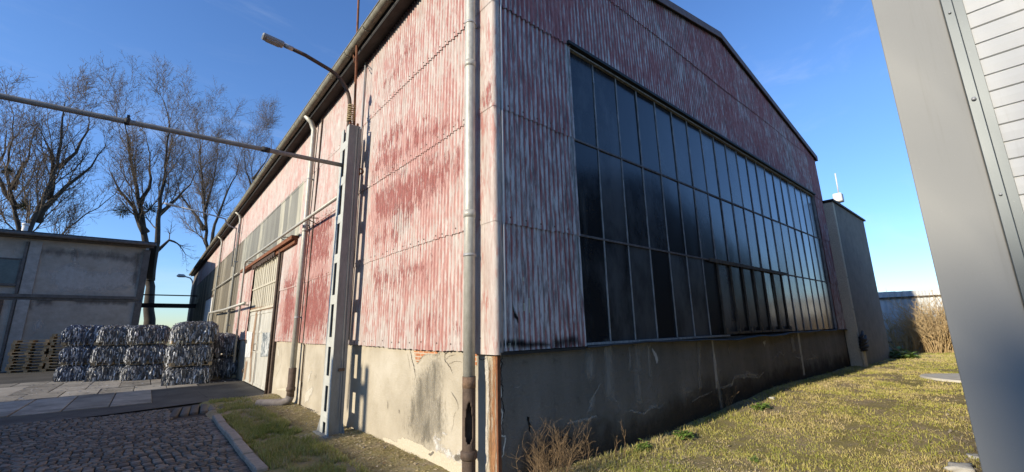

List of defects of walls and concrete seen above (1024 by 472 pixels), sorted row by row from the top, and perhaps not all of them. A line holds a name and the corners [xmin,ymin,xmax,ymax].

water stain [411,364,462,467]
water stain [534,333,850,472]